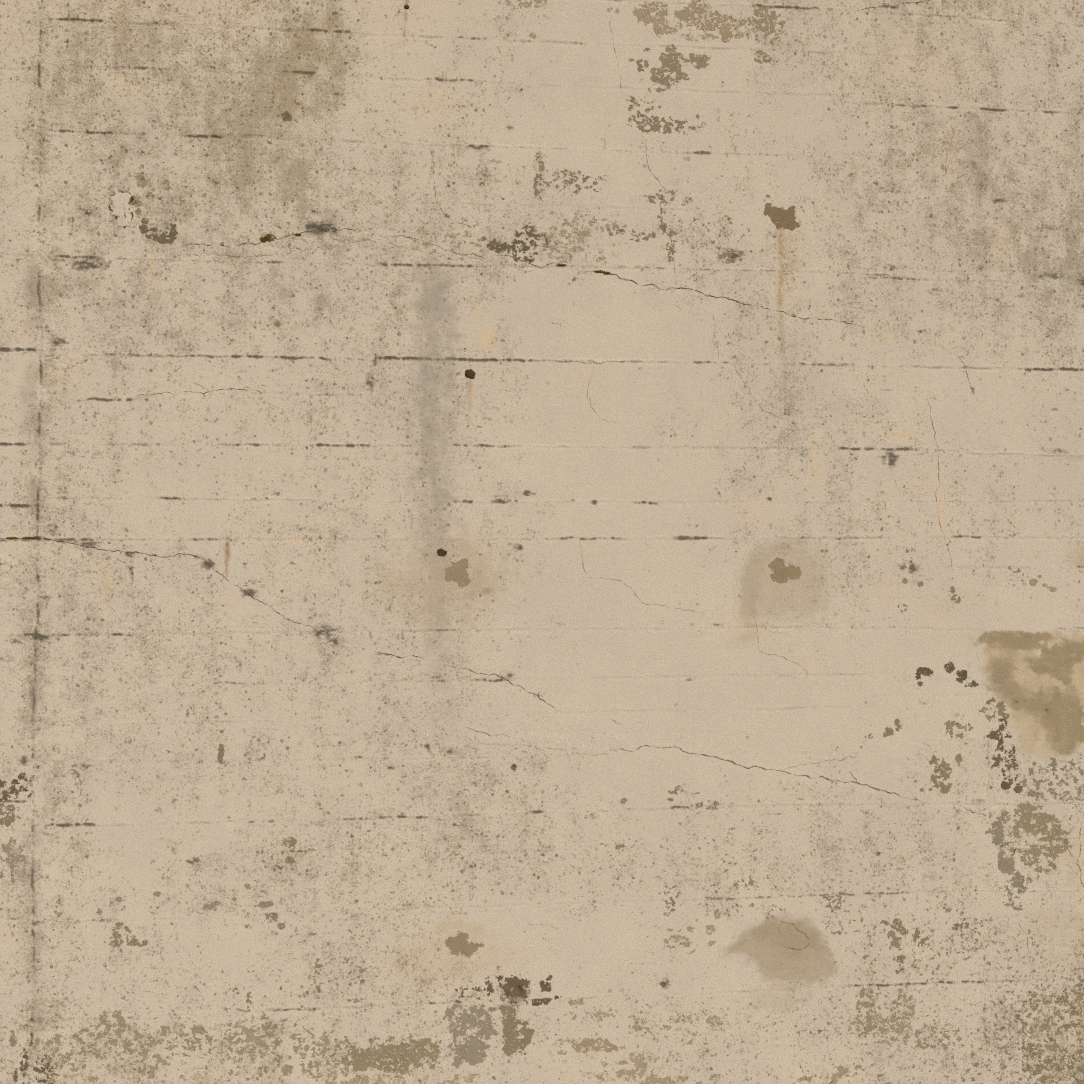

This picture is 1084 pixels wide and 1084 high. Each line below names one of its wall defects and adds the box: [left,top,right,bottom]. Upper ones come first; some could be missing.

peeling [608,0,786,134]
peeling [414,189,692,263]
peeling [534,153,607,199]
crack [581,148,852,416]
peeling [693,215,753,264]
water stain [733,537,844,637]
peeling [0,772,32,881]
crack [620,745,917,800]
peeling [979,697,1084,911]
peeling [557,1037,721,1084]
peeling [628,1010,722,1063]
peeling [1016,979,1084,1084]